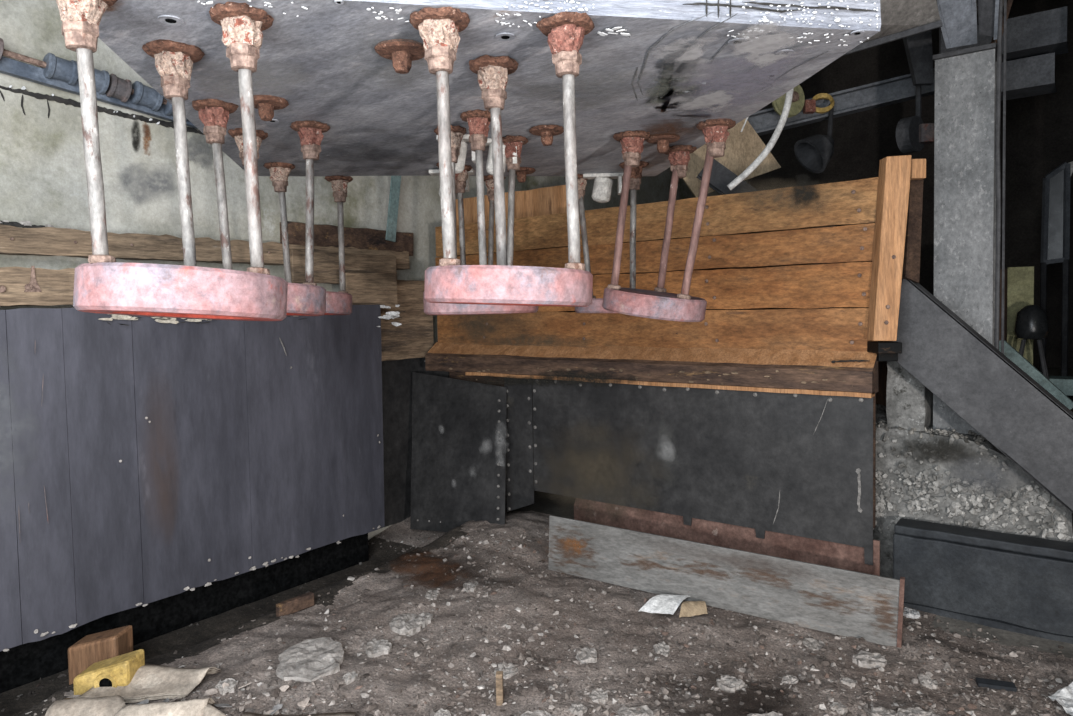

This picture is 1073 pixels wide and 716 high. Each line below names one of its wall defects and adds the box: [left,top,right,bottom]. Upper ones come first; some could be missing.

leakage [631,12,828,111]